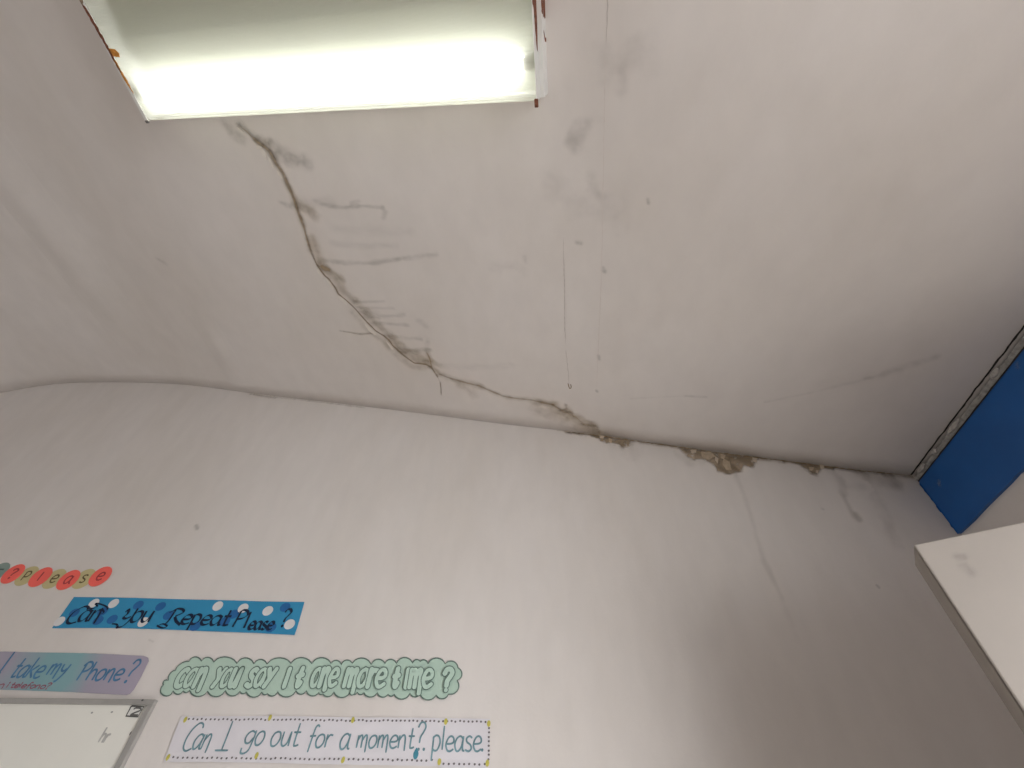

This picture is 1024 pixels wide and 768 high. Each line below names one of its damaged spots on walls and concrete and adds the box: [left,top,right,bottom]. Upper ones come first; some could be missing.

crack [237,124,910,476]
flaking render [681,449,758,474]